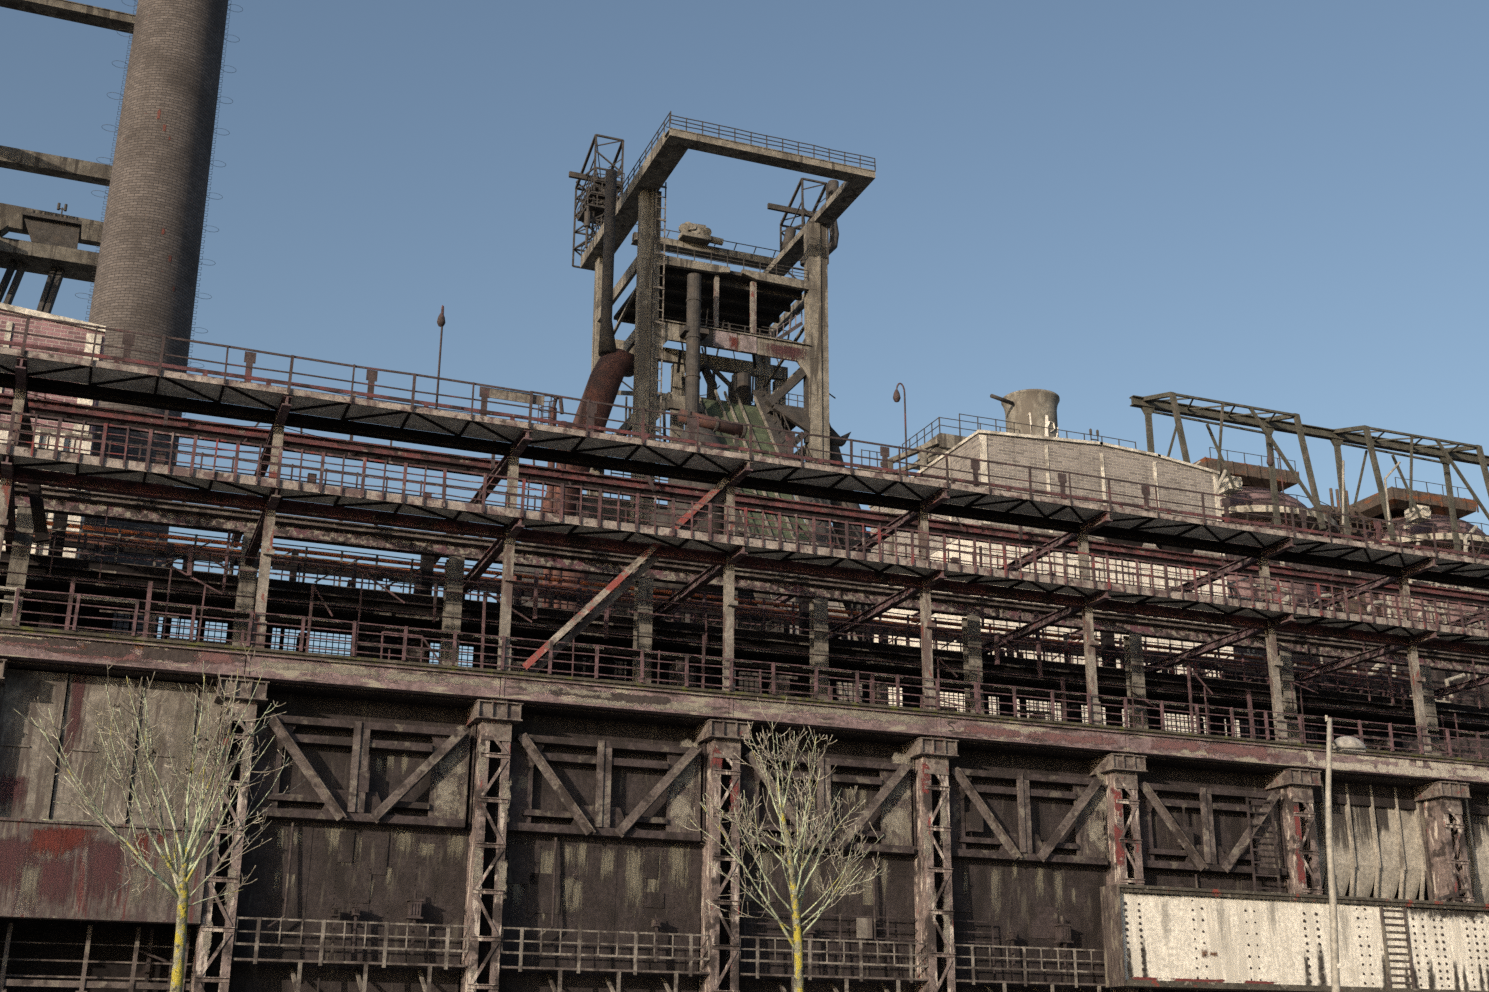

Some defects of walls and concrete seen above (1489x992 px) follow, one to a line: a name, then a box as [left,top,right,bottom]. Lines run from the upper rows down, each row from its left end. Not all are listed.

damp [1313,802,1389,850]
damp [1462,813,1489,846]
corrosion [0,827,167,915]